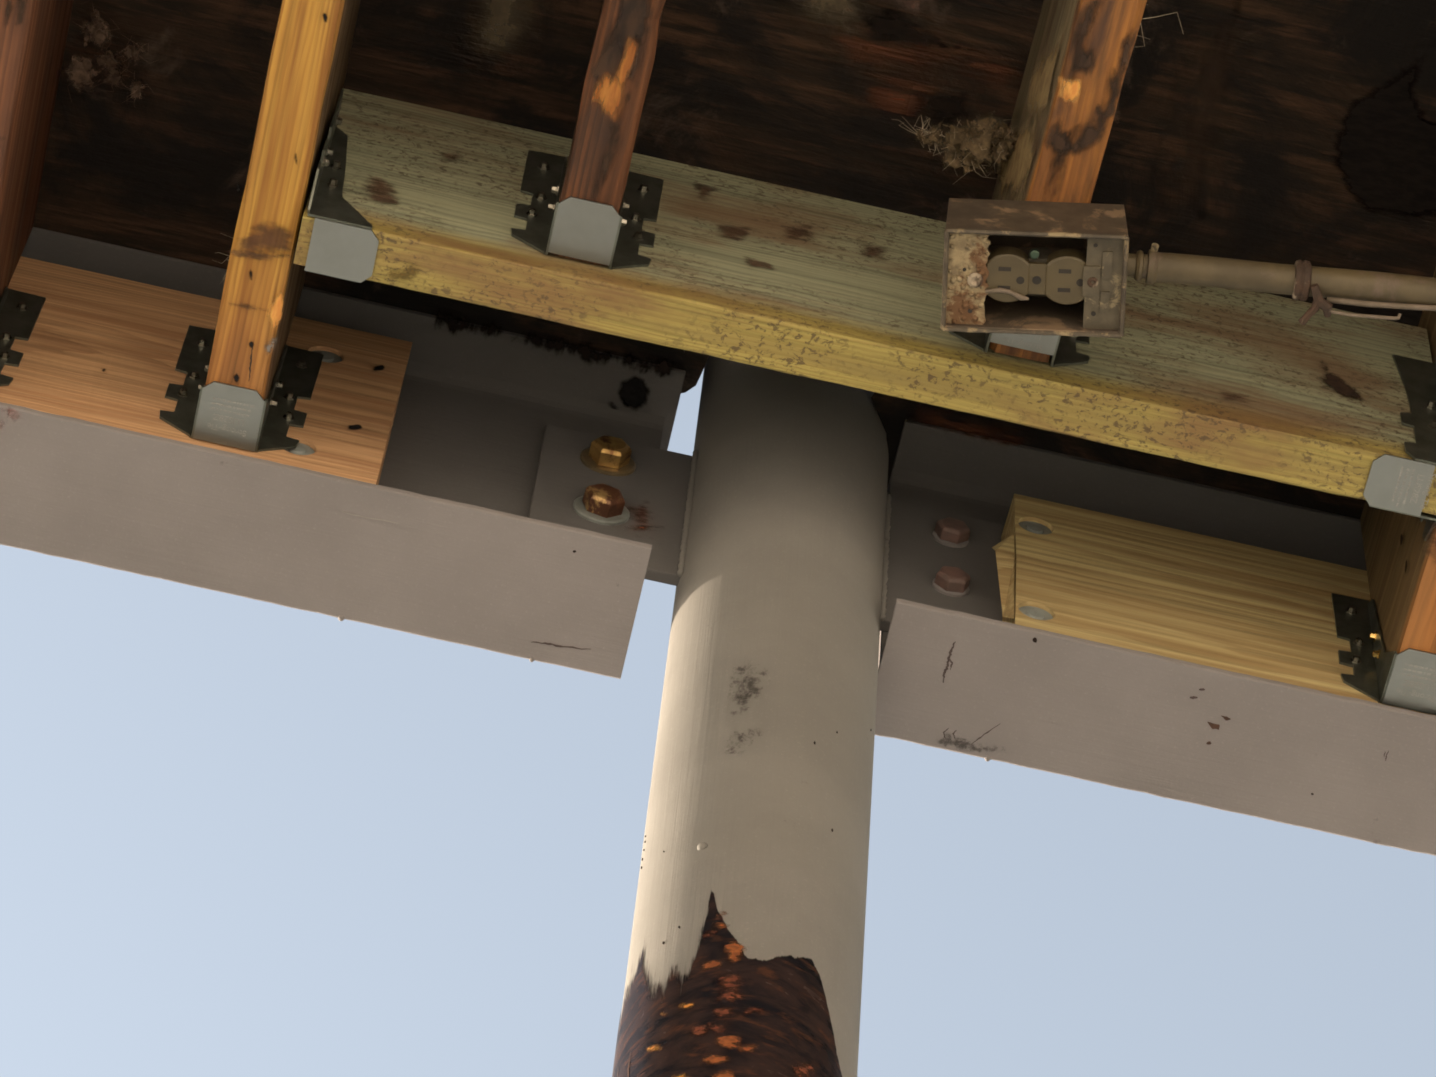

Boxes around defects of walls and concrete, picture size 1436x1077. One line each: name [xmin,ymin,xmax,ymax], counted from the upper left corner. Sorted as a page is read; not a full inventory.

leakage [1069,0,1098,80]
leakage [1046,33,1136,183]
peeling [612,891,842,1077]